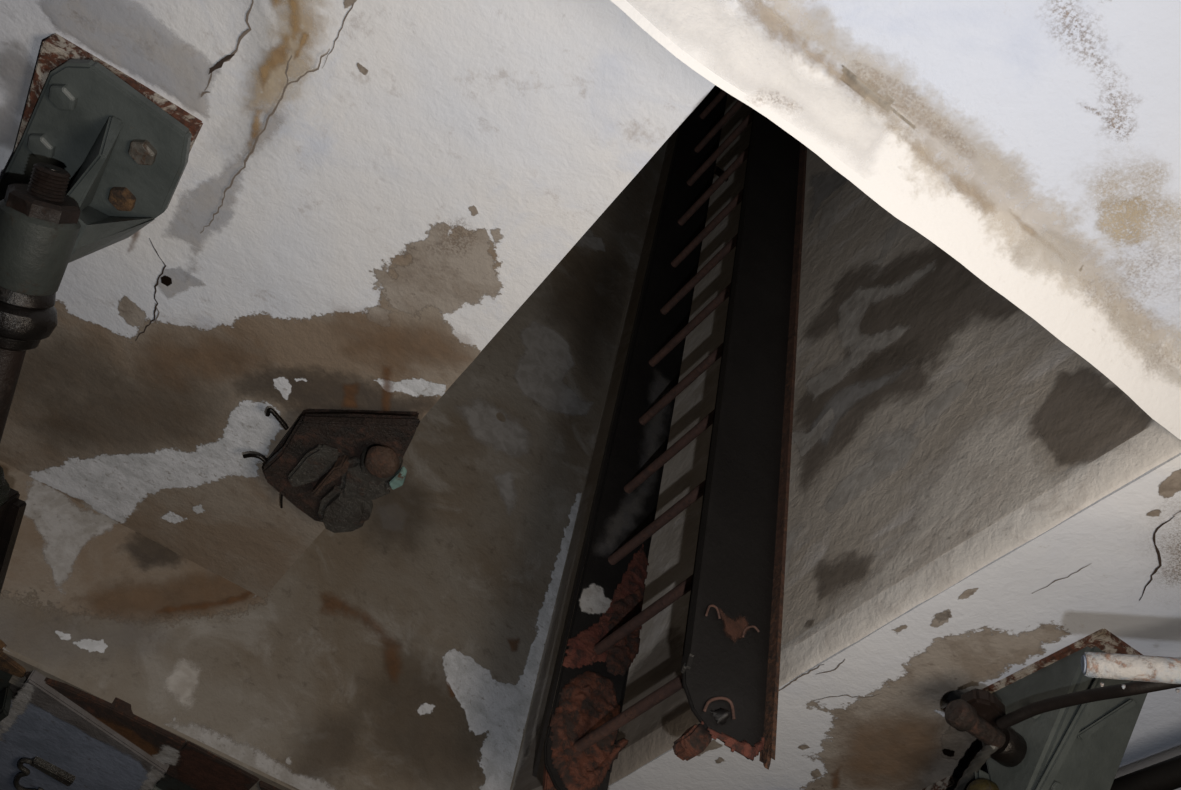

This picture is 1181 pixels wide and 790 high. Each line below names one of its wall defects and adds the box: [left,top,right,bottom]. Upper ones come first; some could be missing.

leakage [754,1,878,103]
crack [201,0,368,233]
leakage [811,171,848,240]
crack [136,238,166,340]
leakage [792,221,1020,486]
peeling [0,205,504,628]
leakage [1031,369,1152,465]
peeling [1147,469,1181,517]
leakage [815,554,871,599]
crack [1139,511,1181,601]
peeling [73,639,108,653]
peeling [417,703,435,715]